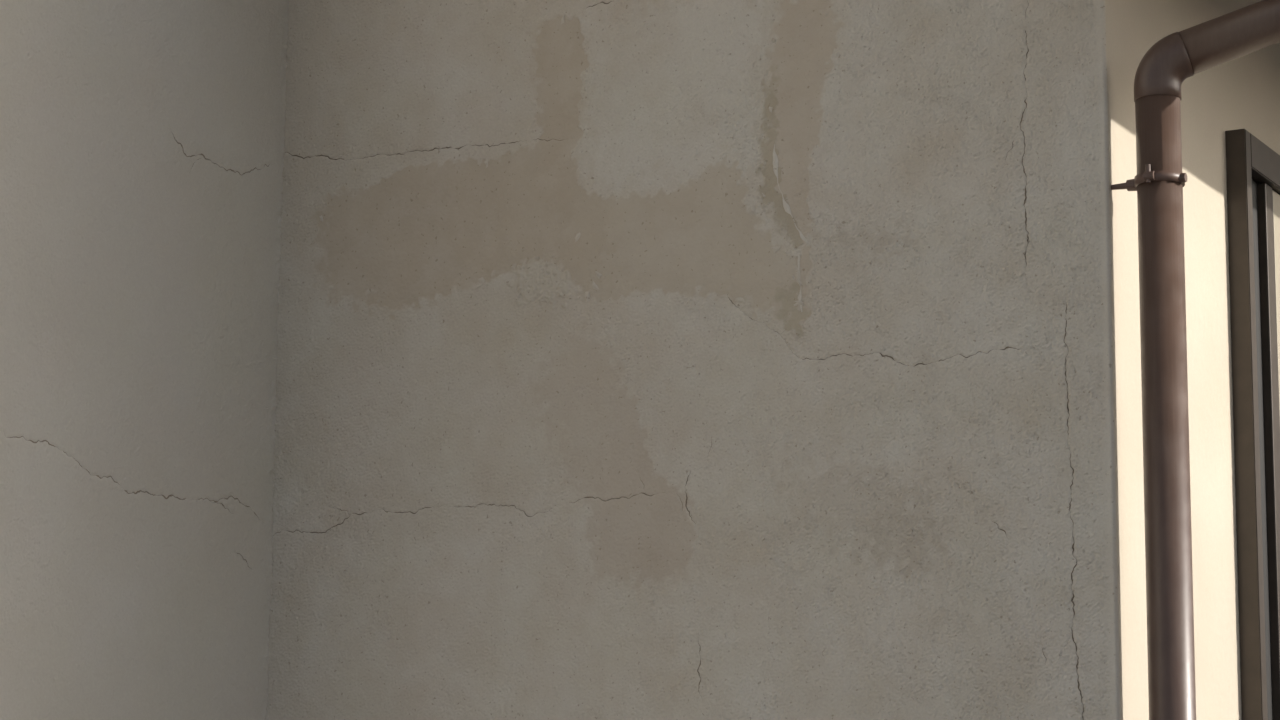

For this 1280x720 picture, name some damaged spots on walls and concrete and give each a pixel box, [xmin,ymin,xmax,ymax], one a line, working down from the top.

crack [1042,304,1084,717]